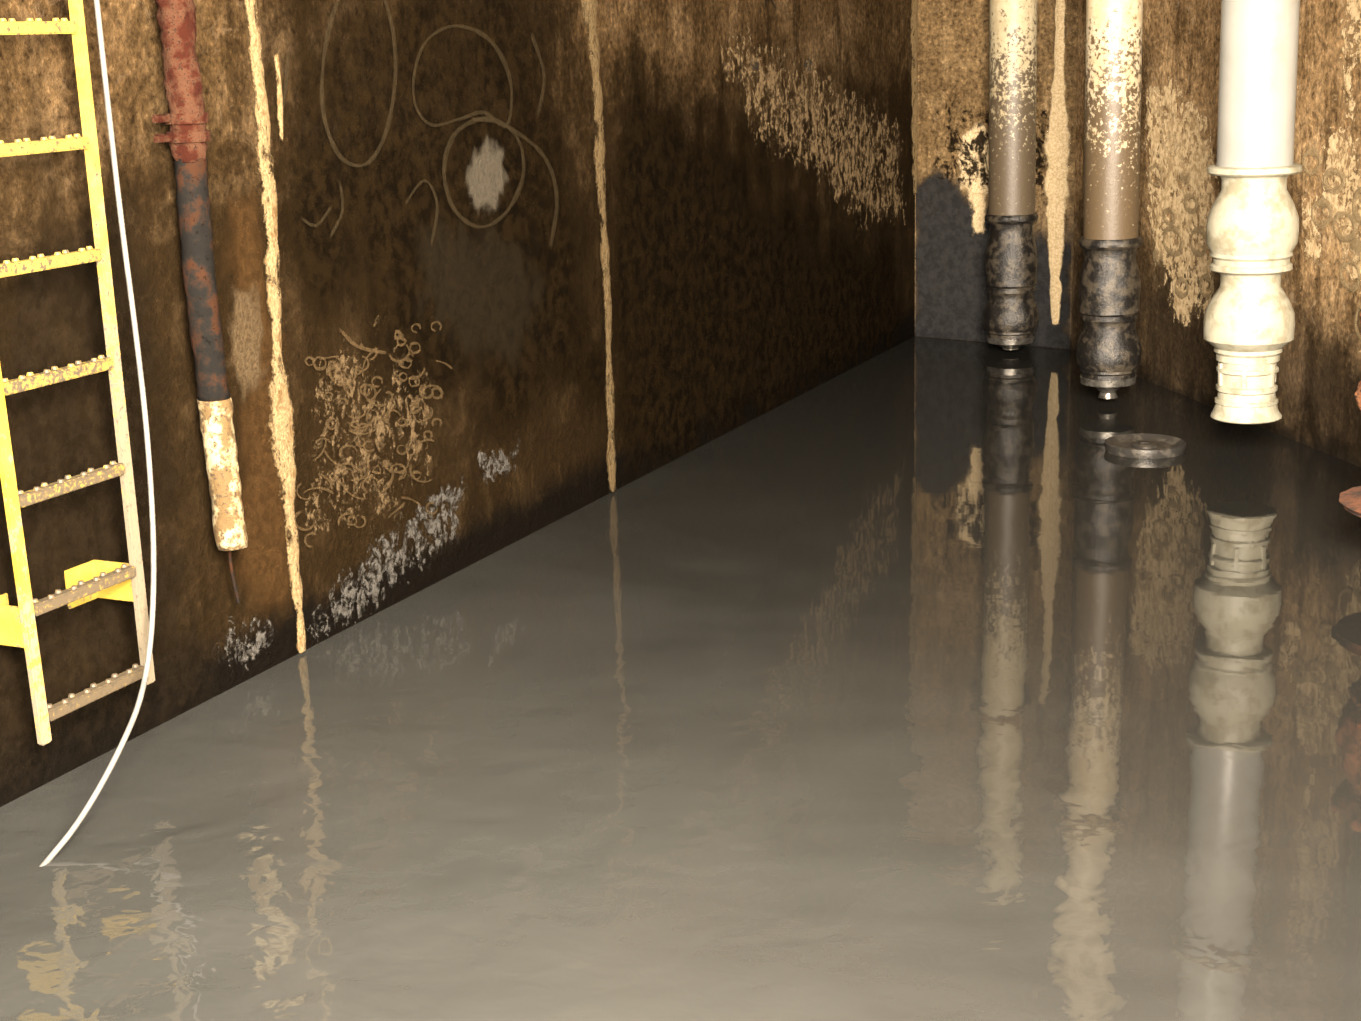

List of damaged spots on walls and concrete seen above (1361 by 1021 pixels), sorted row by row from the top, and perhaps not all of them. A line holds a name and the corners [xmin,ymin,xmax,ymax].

damp [225,0,899,669]